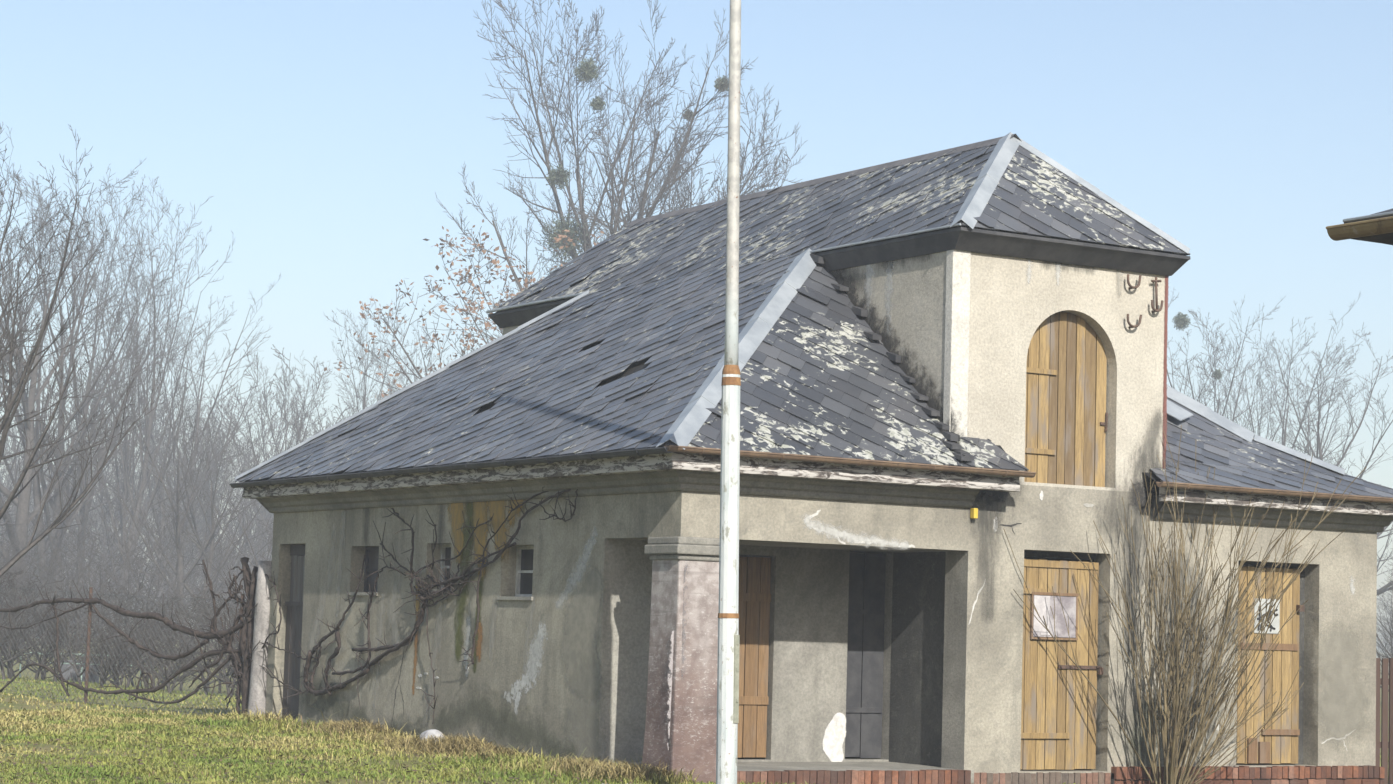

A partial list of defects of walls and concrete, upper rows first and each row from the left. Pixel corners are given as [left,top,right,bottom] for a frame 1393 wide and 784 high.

leakage [391,502,572,758]
peeling [504,623,548,713]
flaking render [822,713,846,762]